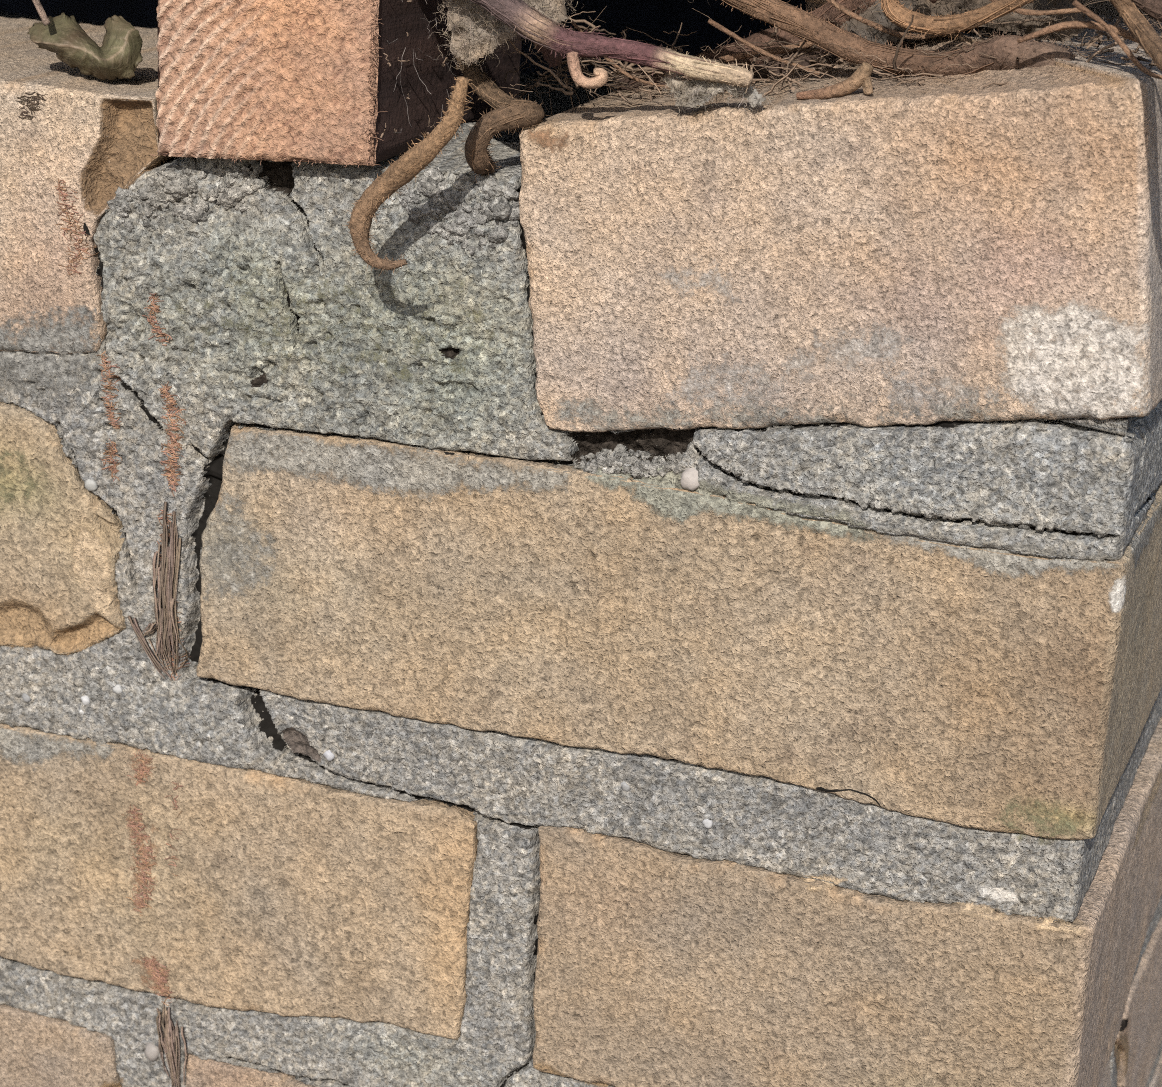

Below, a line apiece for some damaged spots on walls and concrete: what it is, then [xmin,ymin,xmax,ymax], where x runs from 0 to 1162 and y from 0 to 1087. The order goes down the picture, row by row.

spalling [80,99,176,217]
crack [291,199,319,252]
crack [283,282,300,341]
crack [519,222,534,341]
crack [121,380,163,430]
crack [696,422,986,524]
crack [888,420,1001,428]
crack [1015,525,1114,536]
spalling [0,529,121,655]
crack [189,423,573,836]
crack [532,892,540,993]
spalling [1114,1034,1130,1075]